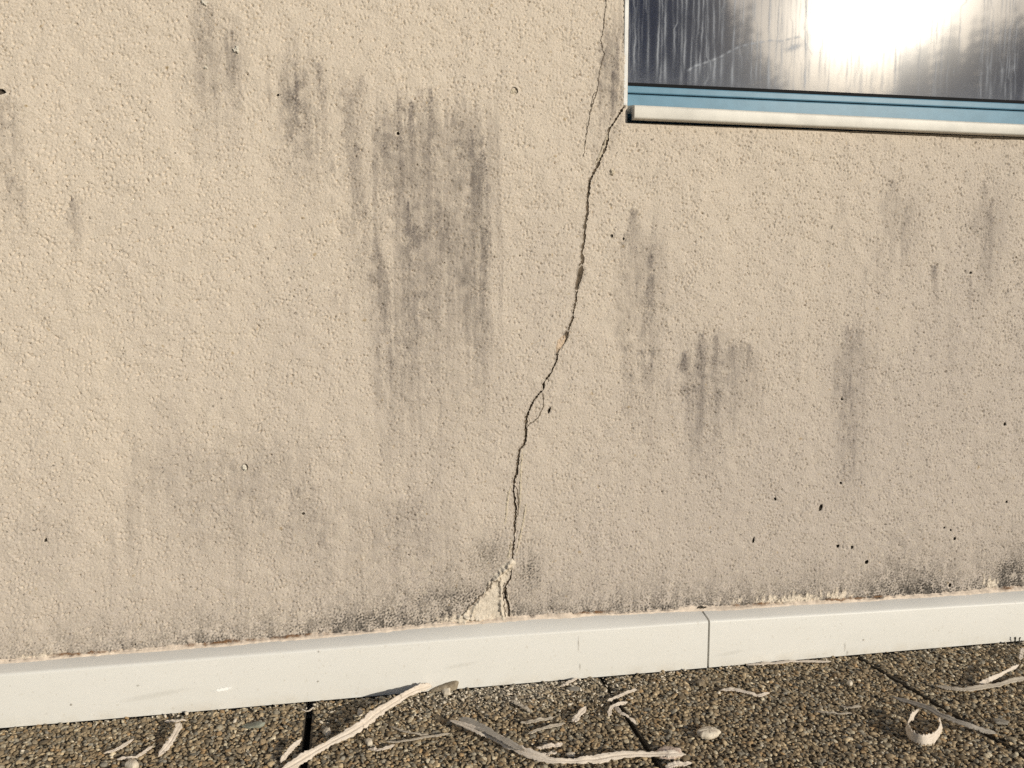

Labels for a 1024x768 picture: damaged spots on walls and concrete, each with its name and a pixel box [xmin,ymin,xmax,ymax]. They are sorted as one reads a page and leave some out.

crack [461,0,626,617]
water stain [176,593,470,645]
water stain [512,593,762,617]
water stain [839,564,1024,599]